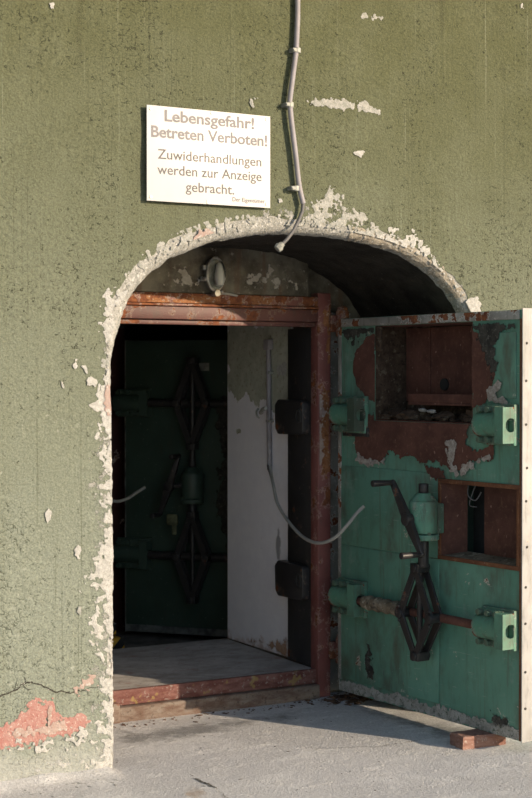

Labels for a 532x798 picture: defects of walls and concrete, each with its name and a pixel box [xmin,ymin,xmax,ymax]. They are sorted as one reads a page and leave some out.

rust [140,294,221,304]
rust [353,334,375,402]
rust [472,331,495,408]
peeling [486,380,508,404]
rust [355,413,494,471]
peeling [0,186,491,770]
peeling [339,679,521,740]